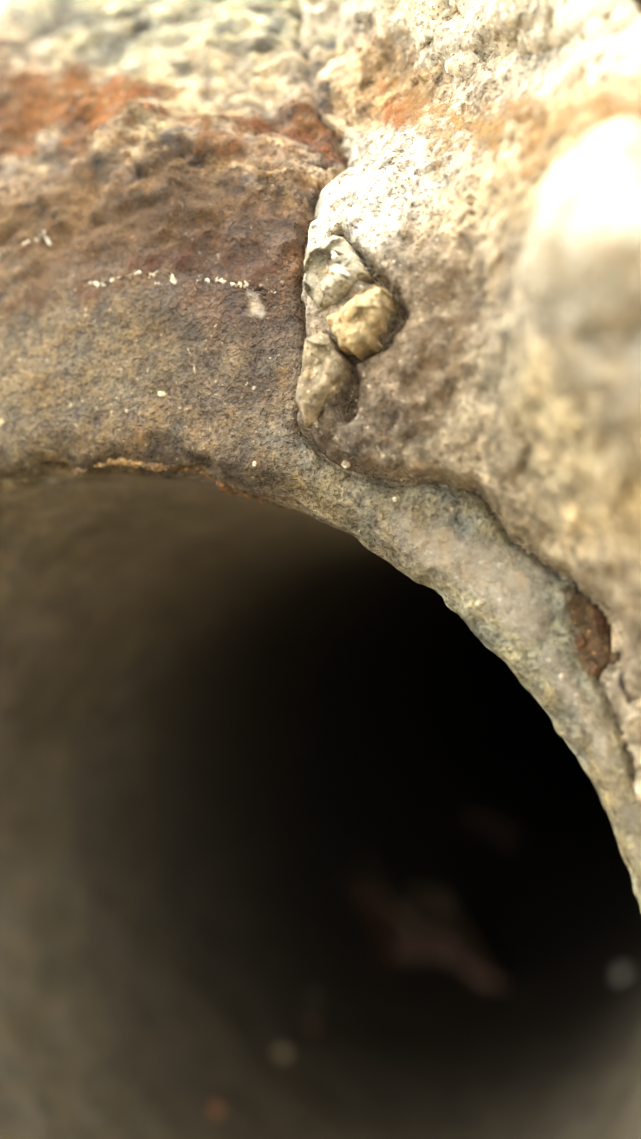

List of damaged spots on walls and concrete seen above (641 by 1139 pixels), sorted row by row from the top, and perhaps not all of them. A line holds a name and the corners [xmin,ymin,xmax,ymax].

rust [0,57,342,161]